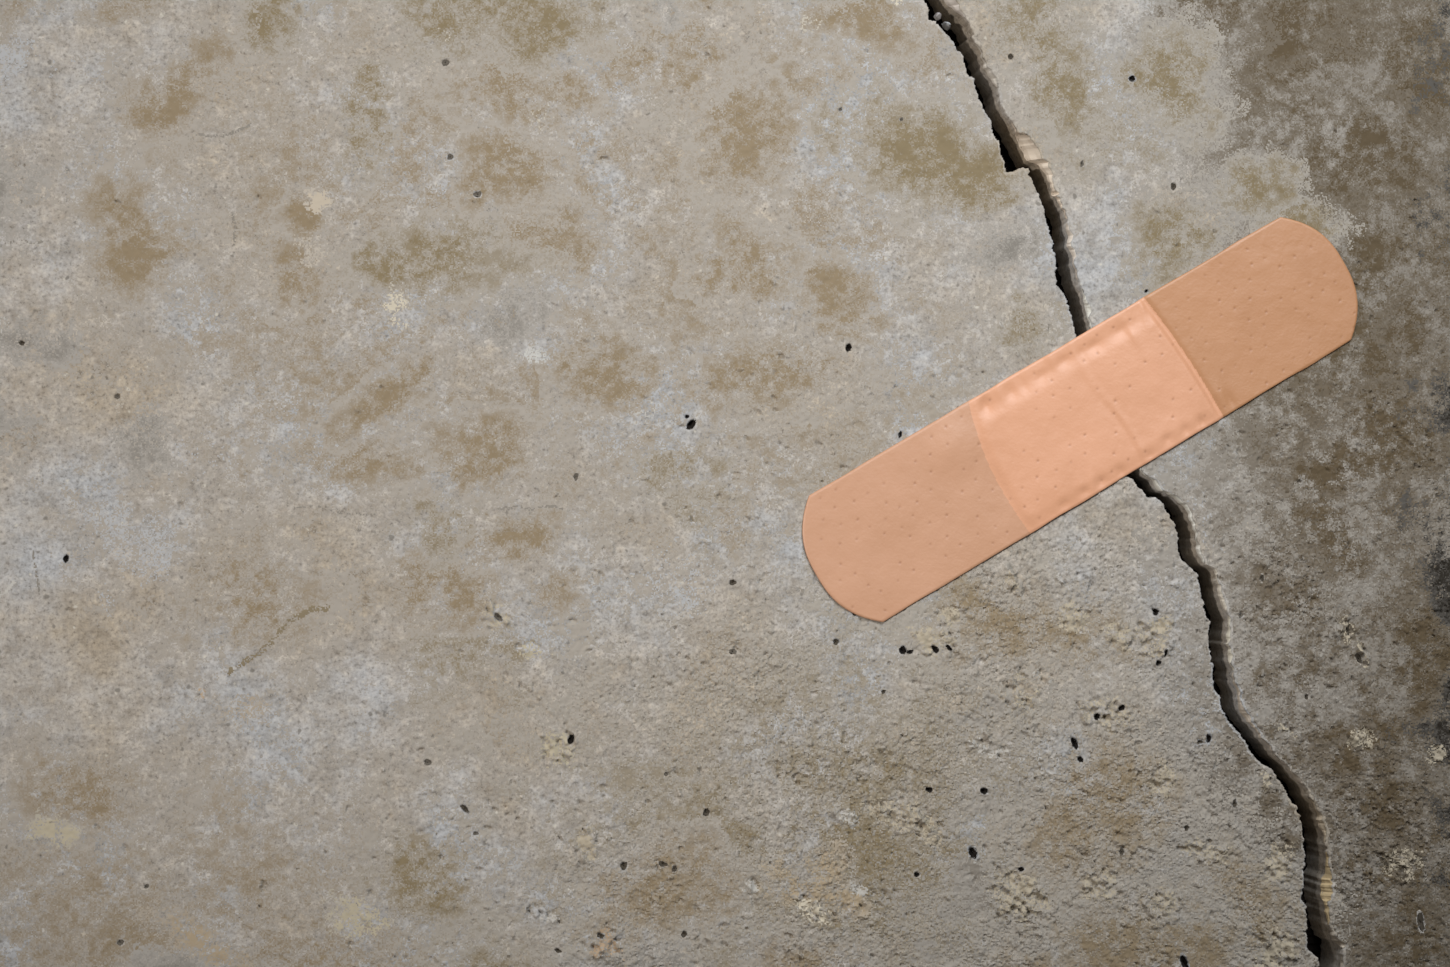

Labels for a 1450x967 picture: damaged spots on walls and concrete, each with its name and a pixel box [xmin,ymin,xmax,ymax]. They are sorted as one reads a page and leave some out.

crack [924,0,1017,172]
crack [1044,213,1076,334]
crack [1125,476,1322,961]